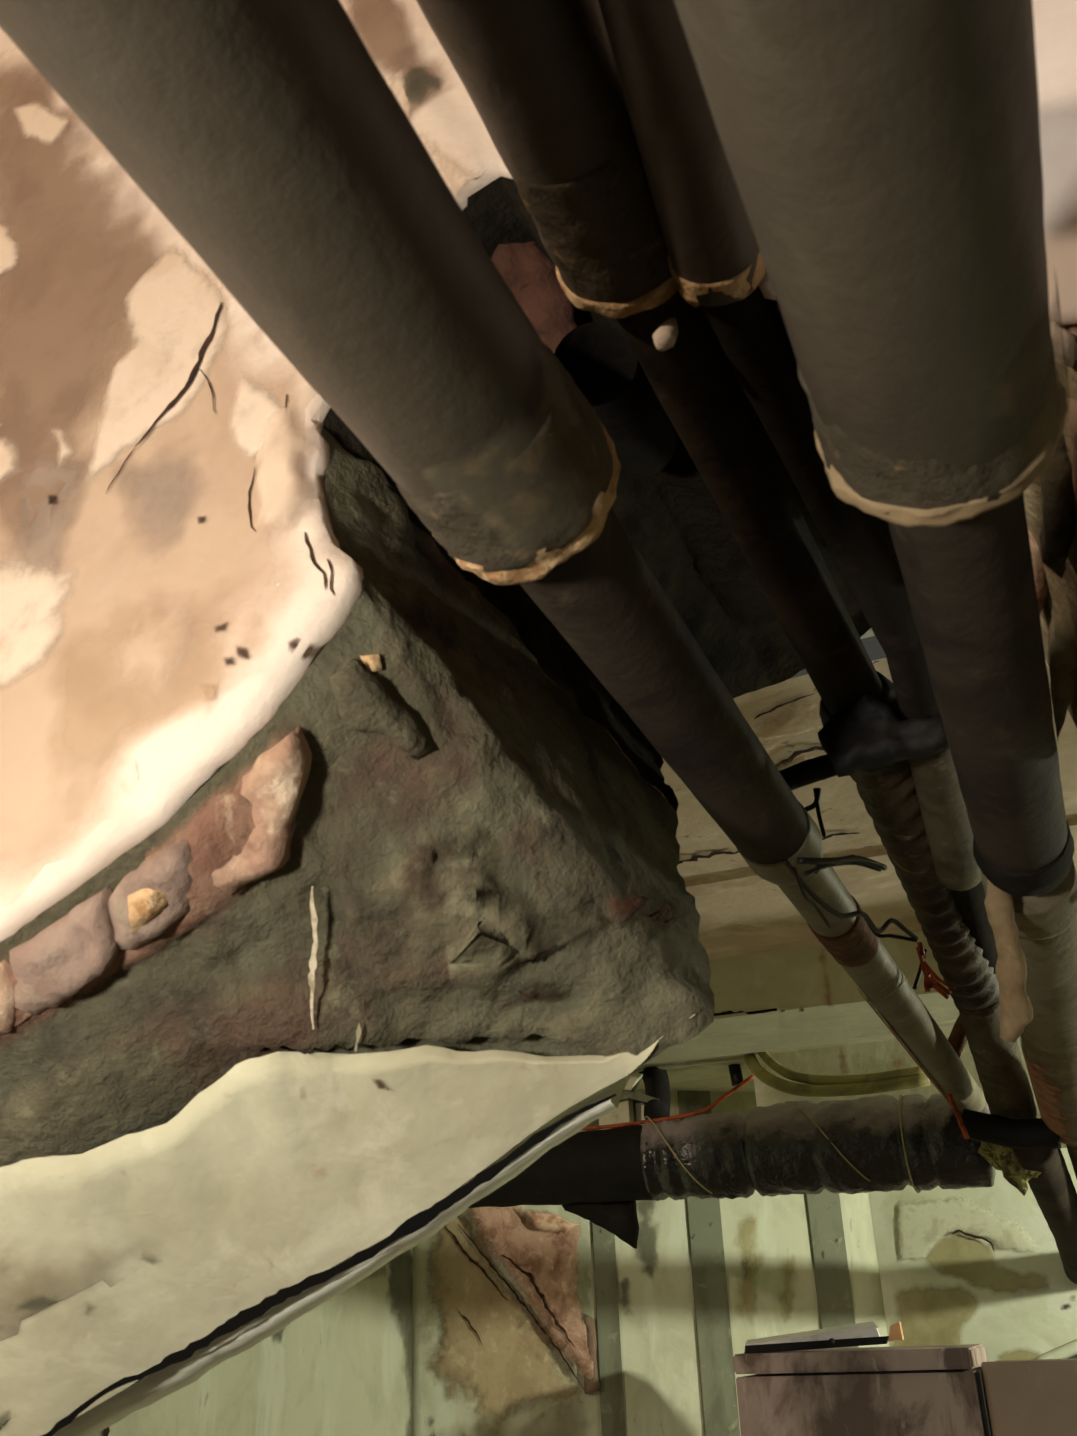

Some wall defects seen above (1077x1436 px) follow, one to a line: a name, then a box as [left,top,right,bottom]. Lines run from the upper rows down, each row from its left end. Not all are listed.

crack [106,302,222,493]
spalling [1050,321,1077,368]
spalling [0,426,715,1167]
crack [43,1094,616,1436]
damp [390,1250,413,1436]
spalling [429,1206,600,1420]